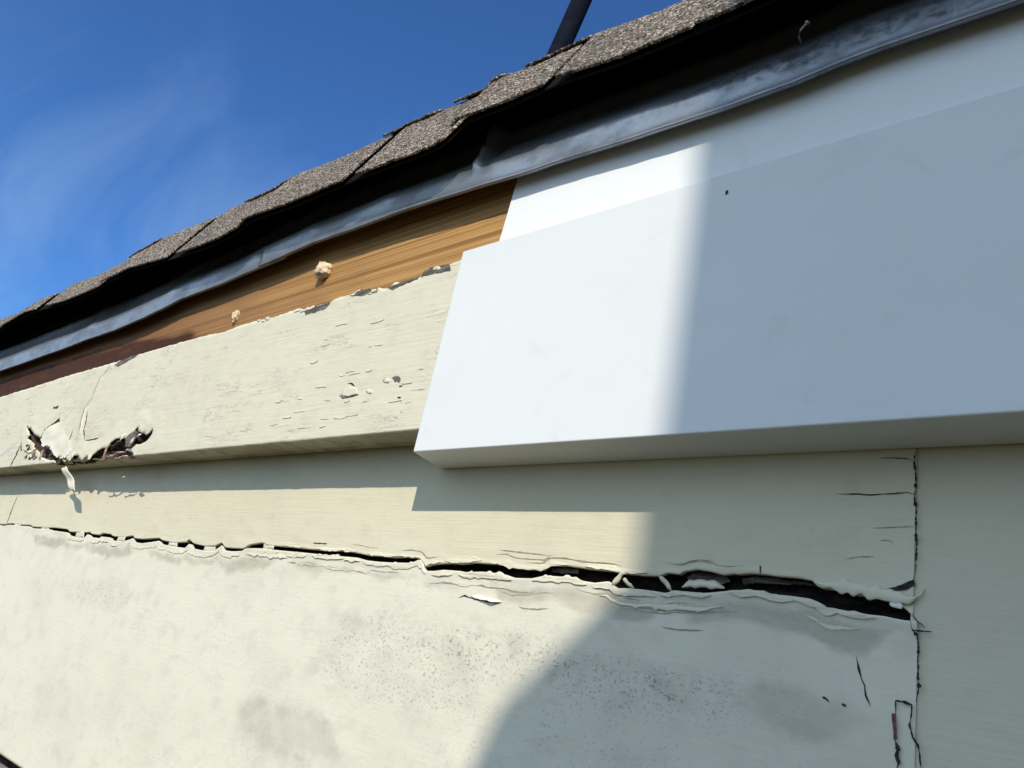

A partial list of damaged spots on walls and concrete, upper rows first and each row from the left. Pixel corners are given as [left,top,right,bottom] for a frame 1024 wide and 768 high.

peeling [350,264,451,296]
peeling [294,303,330,315]
peeling [324,369,373,402]
peeling [383,376,423,403]
peeling [20,422,75,491]
crack [0,449,932,768]
peeling [461,595,502,604]